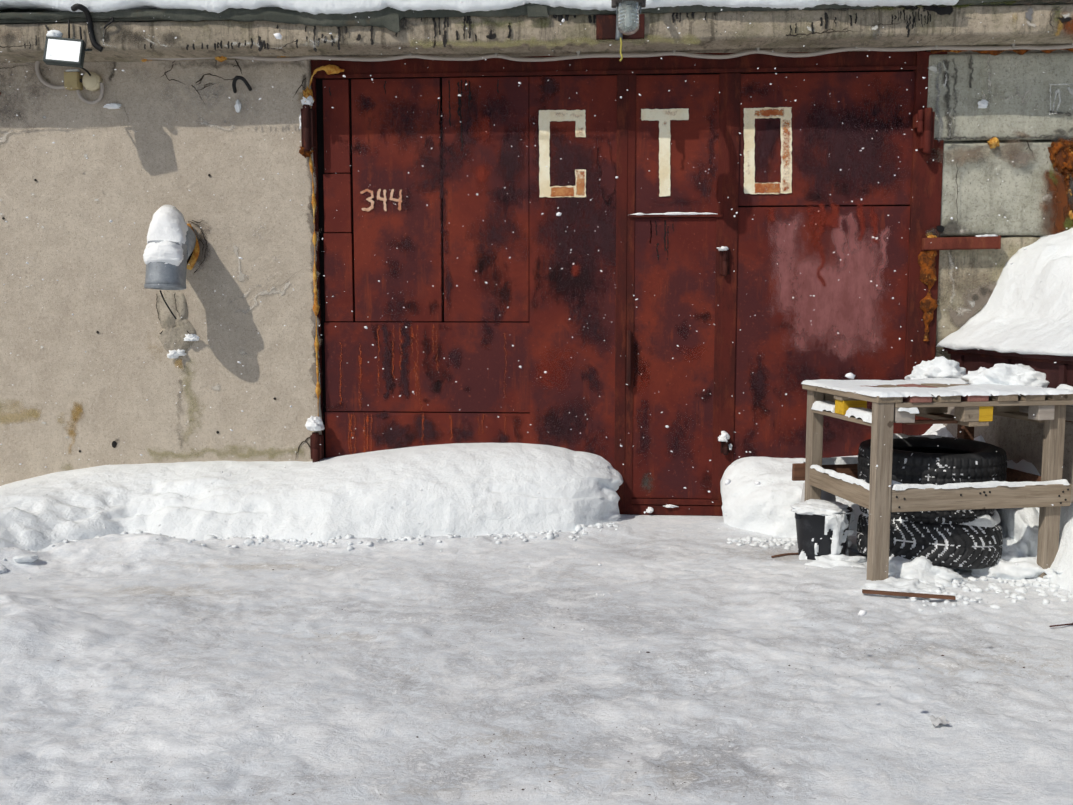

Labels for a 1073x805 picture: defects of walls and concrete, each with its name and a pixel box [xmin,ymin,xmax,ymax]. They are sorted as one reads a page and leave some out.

damp [295,26,374,50]
damp [438,16,496,47]
rust [386,89,616,343]
rust [749,90,902,251]
rust [1042,135,1073,235]
rust [348,326,484,454]
rust [537,402,589,445]